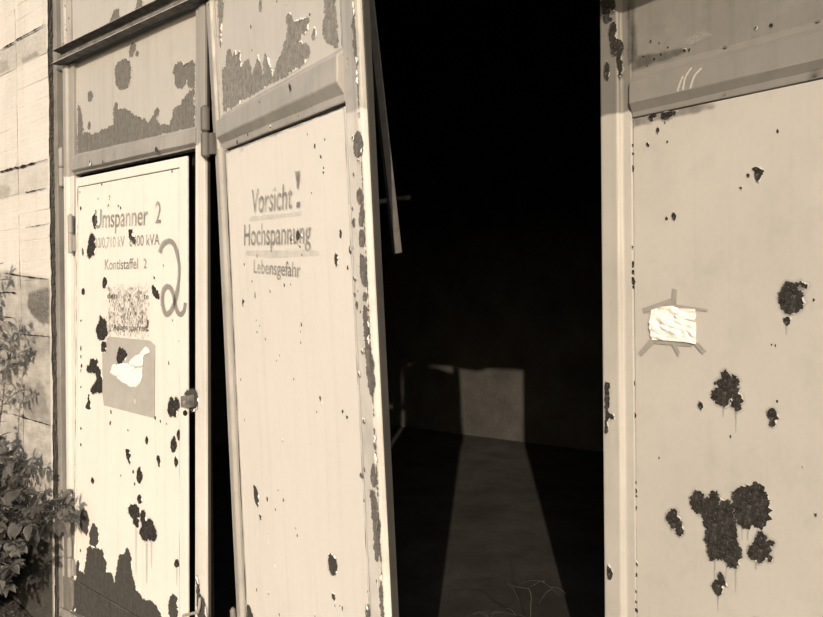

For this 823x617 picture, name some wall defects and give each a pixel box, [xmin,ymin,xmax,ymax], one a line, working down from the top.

peeling [77,59,196,166]
peeling [217,0,339,112]
peeling [351,0,359,117]
rust [600,0,625,81]
peeling [27,0,178,617]